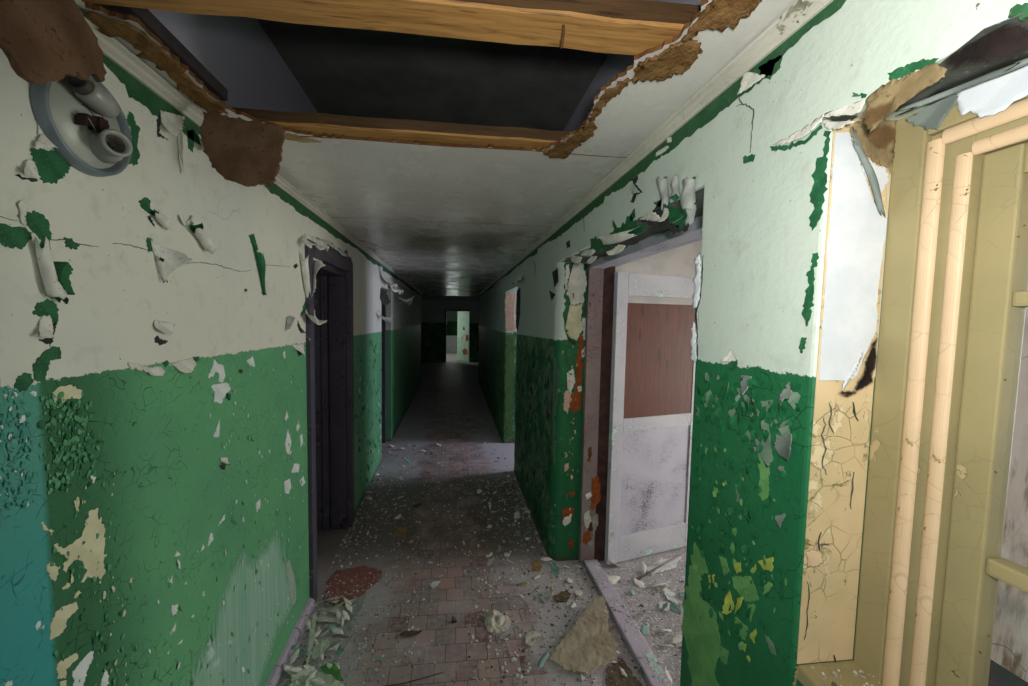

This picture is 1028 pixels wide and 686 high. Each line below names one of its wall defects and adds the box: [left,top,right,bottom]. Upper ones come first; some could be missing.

peeling [0,200,80,399]
peeling [16,124,71,184]
crack [51,239,153,252]
peeling [103,54,204,173]
peeling [138,197,218,283]
peeling [249,234,267,296]
peeling [259,183,421,358]
peeling [480,0,846,438]
peeling [770,58,1028,391]
flaking render [35,500,106,640]
flaking render [56,651,94,686]
peeling [646,542,777,686]